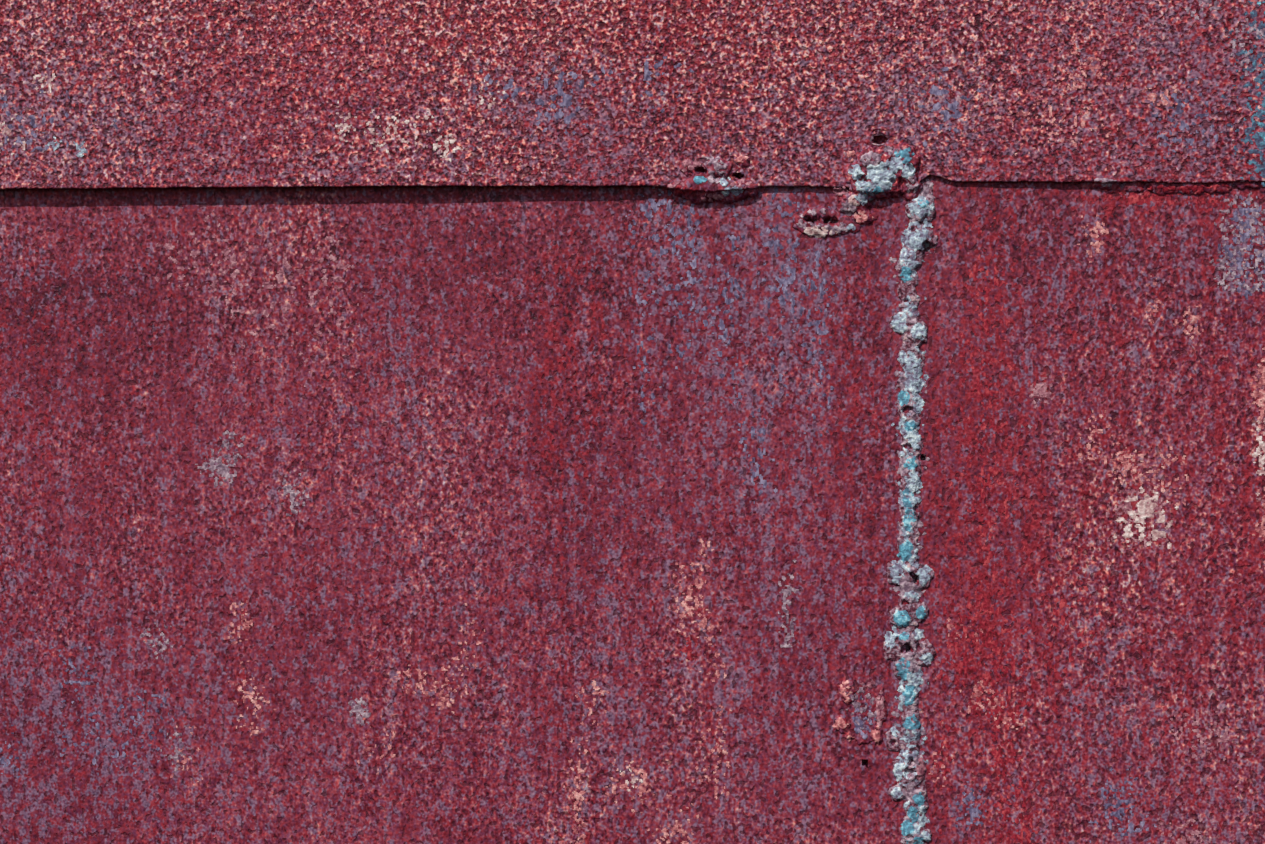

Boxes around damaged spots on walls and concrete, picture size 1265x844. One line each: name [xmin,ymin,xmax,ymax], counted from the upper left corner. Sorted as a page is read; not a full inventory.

rust [667,155,759,205]
rust [793,206,879,238]
rust [1080,187,1252,215]
rust [1249,347,1265,537]
peeling [833,146,935,844]
rust [929,187,1095,844]
rust [227,600,253,644]
rust [667,538,727,682]
rust [170,726,203,786]
rust [228,660,276,736]
rust [832,679,888,769]